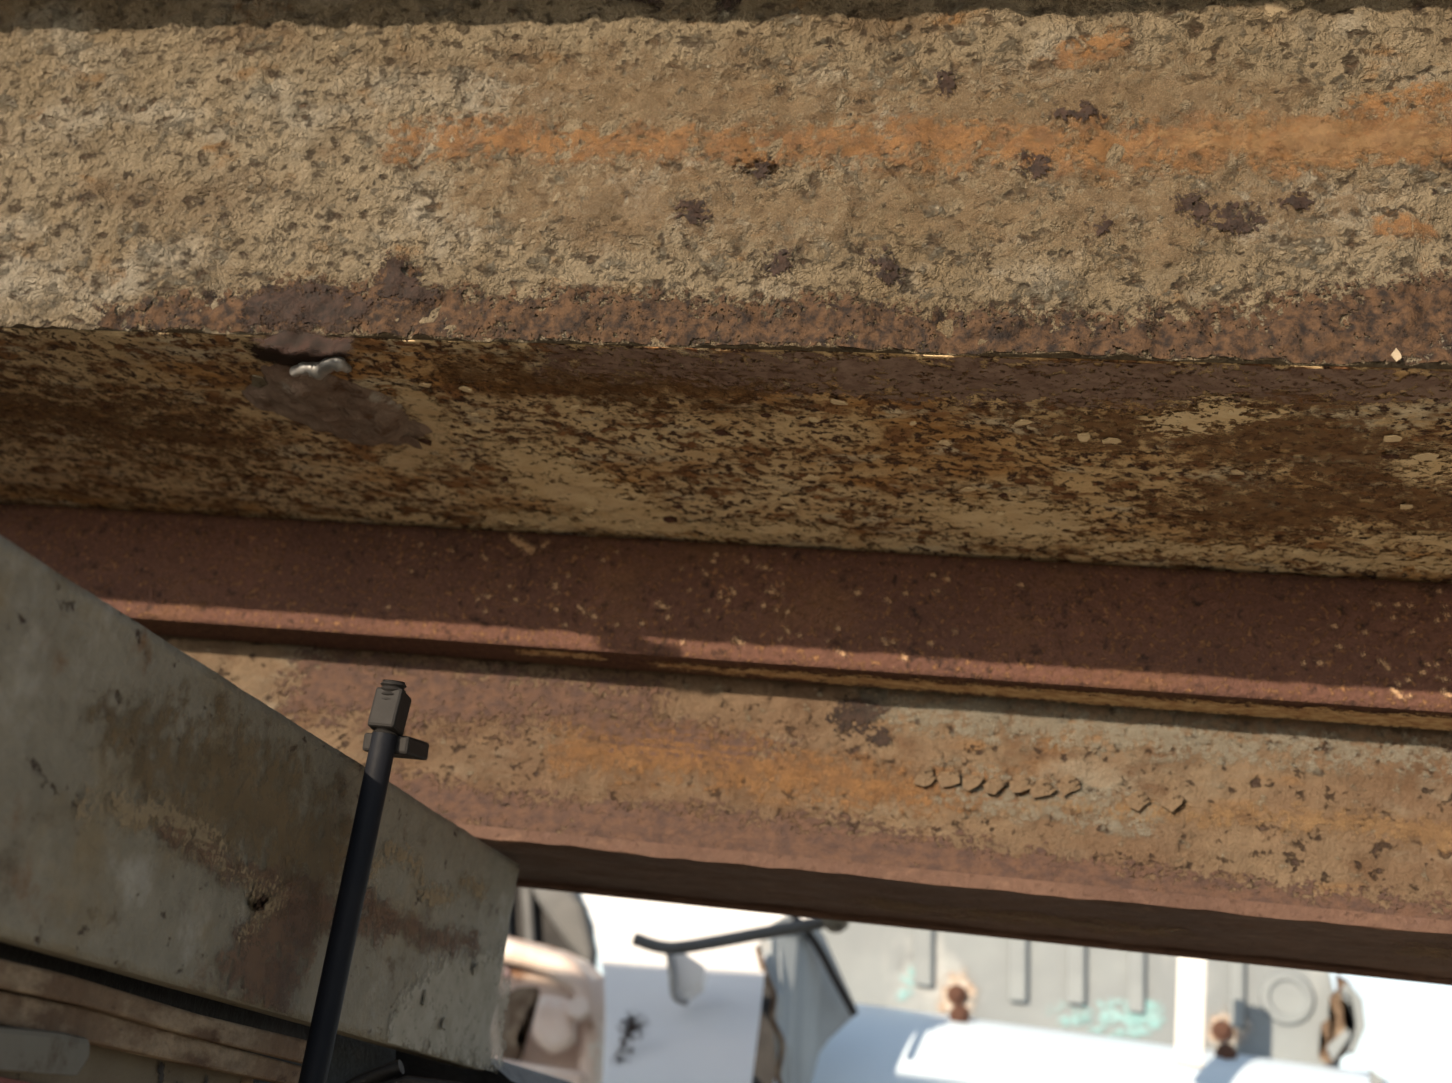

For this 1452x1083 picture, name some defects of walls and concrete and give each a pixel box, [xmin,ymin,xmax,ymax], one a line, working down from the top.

rust [0,376,299,477]
rust [91,250,1452,543]
peeling [1077,432,1121,444]
peeling [1137,395,1290,439]
peeling [1381,435,1452,487]
peeling [473,441,847,641]
peeling [897,487,1452,622]